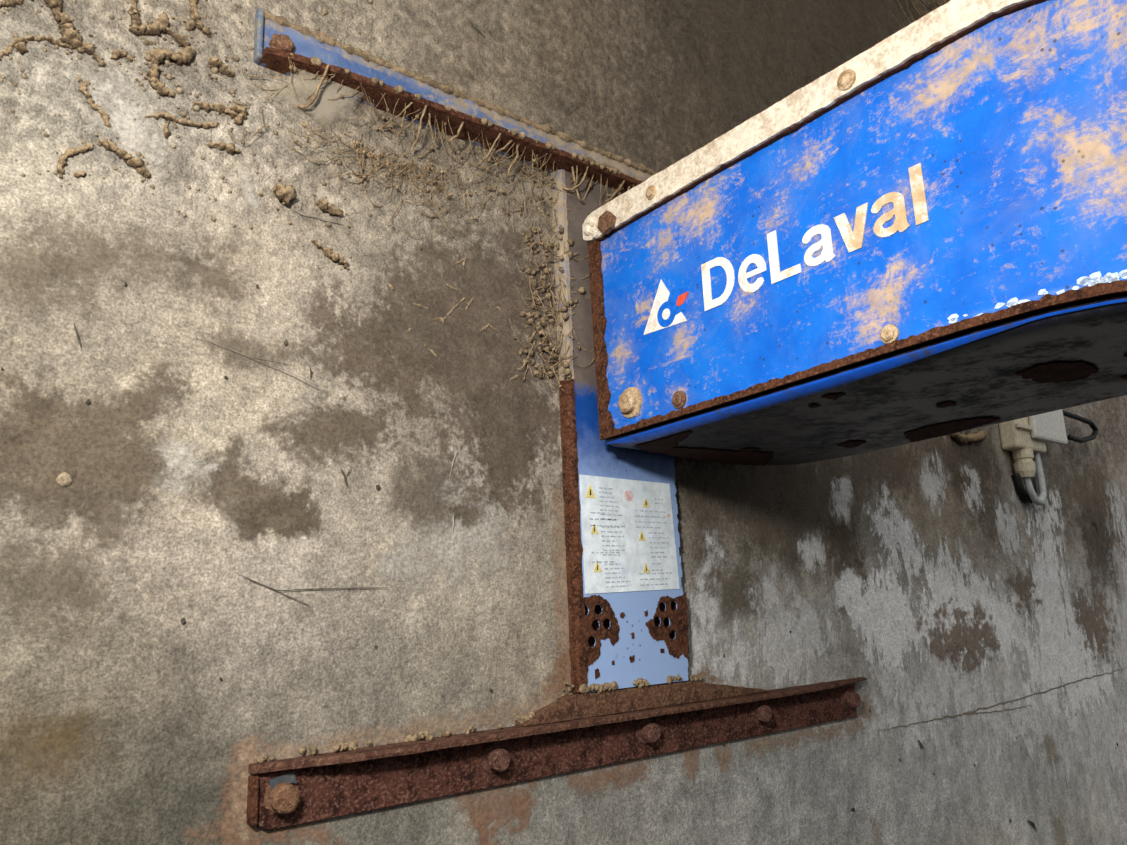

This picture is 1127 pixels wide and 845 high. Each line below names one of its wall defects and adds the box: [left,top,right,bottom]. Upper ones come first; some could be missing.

leakage [0,223,240,302]
leakage [211,334,294,367]
leakage [262,222,561,527]
leakage [0,363,190,545]
leakage [190,438,319,540]
leakage [675,430,1013,625]
leakage [1033,443,1127,588]
rust [193,490,720,845]
crack [877,667,1126,749]